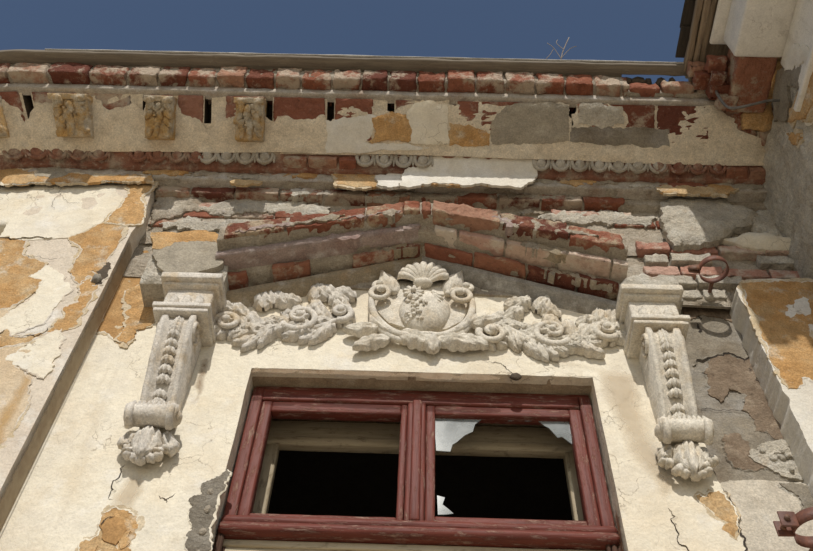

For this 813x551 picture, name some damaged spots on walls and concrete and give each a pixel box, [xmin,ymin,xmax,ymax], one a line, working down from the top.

peeling [369,111,412,144]
spalling [740,57,813,148]
peeling [331,174,400,191]
spalling [656,184,783,252]
peeling [0,168,159,449]
spalling [682,307,732,322]
crack [692,352,759,381]
peeling [737,278,813,389]
spalling [702,354,813,511]
peeling [75,505,145,551]
spalling [183,468,232,551]
crack [669,508,692,551]